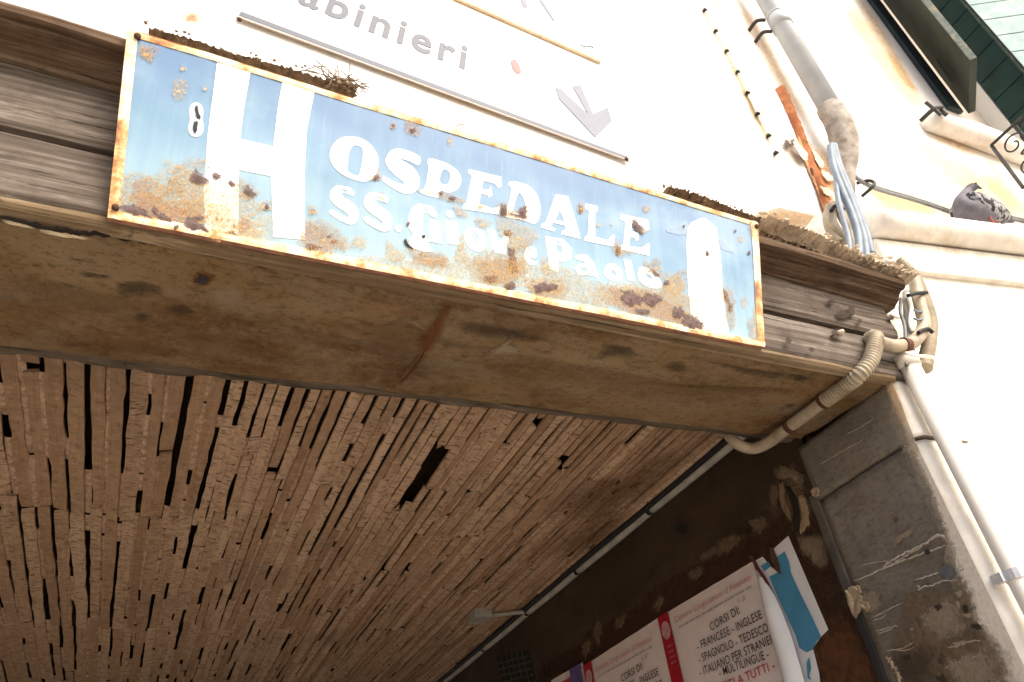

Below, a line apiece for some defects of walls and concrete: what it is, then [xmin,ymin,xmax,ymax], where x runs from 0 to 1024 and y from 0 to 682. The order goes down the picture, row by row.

corrosion [398,305,451,385]
flaking render [540,462,881,682]
spalling [886,383,1024,682]